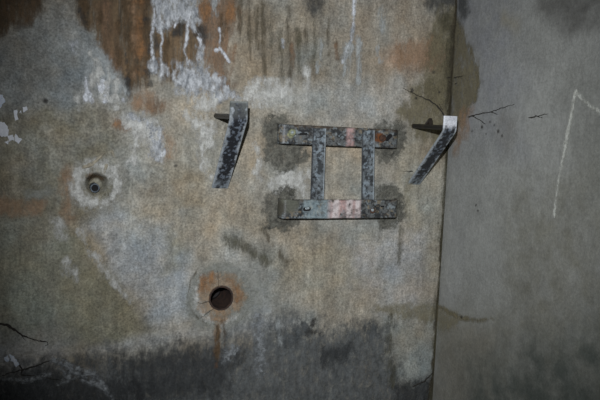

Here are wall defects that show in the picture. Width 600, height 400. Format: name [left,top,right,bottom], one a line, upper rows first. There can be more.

leakage [148,0,294,177]
leakage [303,64,319,103]
crack [404,0,462,116]
leakage [270,166,311,196]
crack [0,323,48,346]
leakage [0,311,432,400]
crack [413,187,446,400]